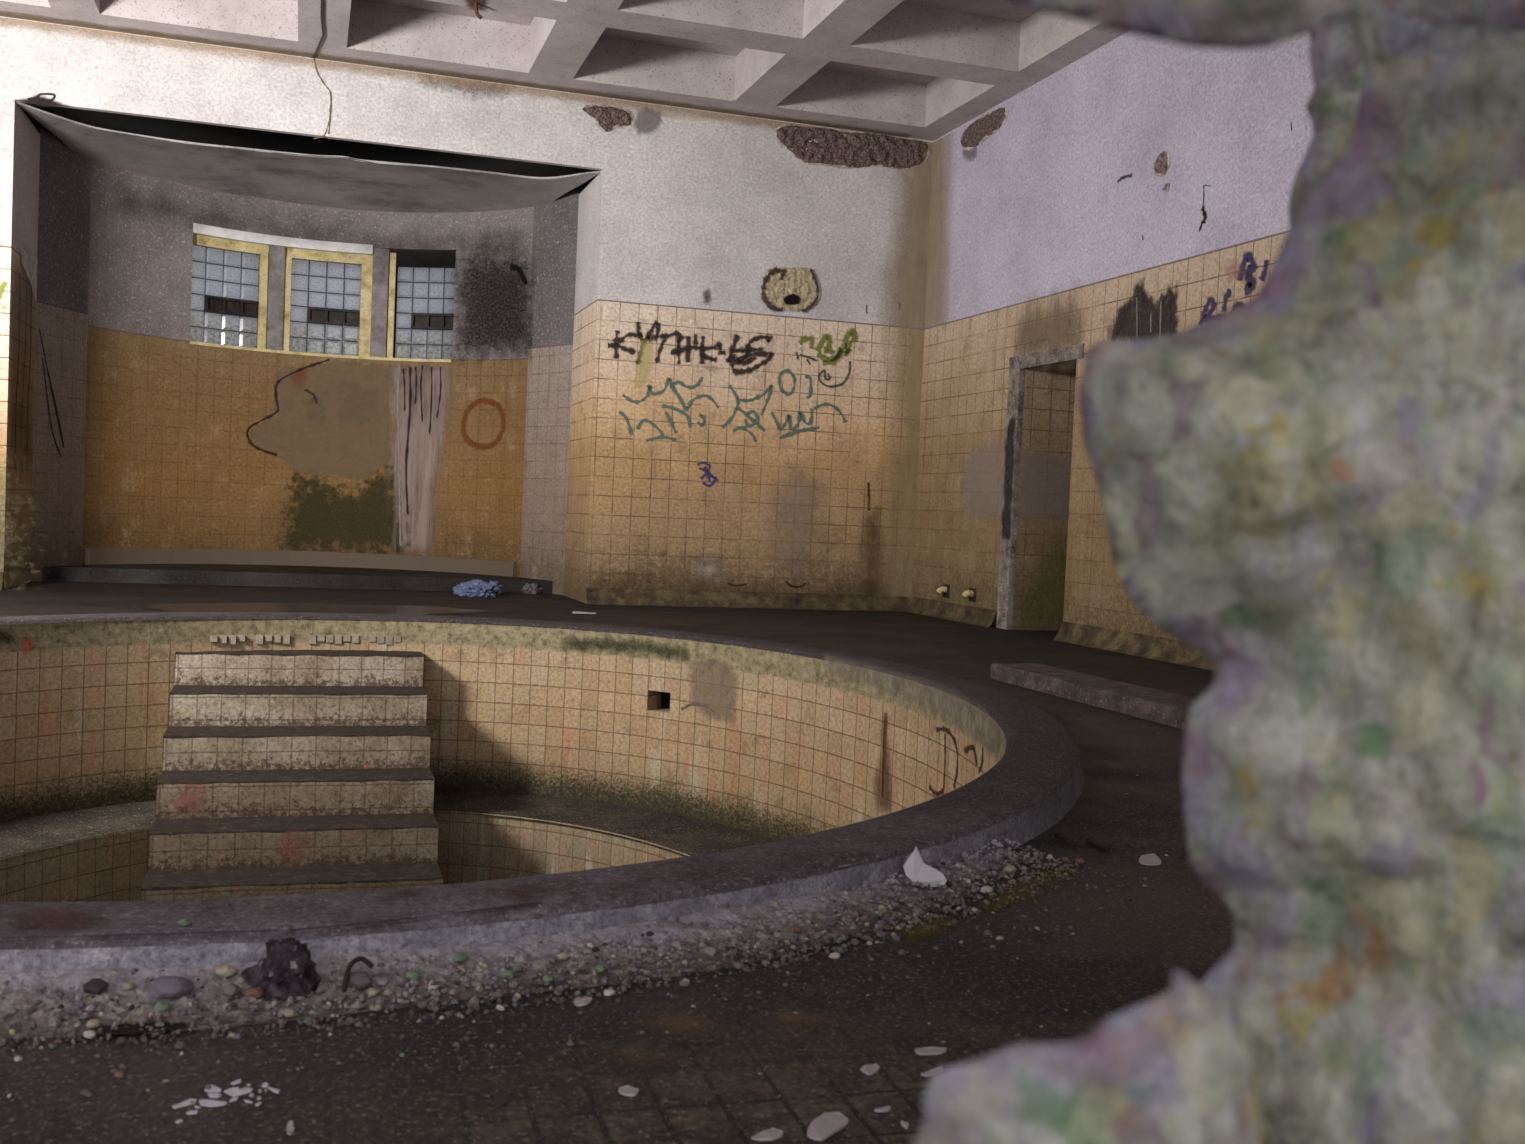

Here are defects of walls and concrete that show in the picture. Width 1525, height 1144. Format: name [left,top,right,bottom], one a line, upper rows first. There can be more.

spalling [20,93,600,194]
spalling [582,104,660,133]
spalling [776,124,931,170]
spalling [960,107,1009,159]
water stain [454,255,533,356]
water stain [390,364,449,553]